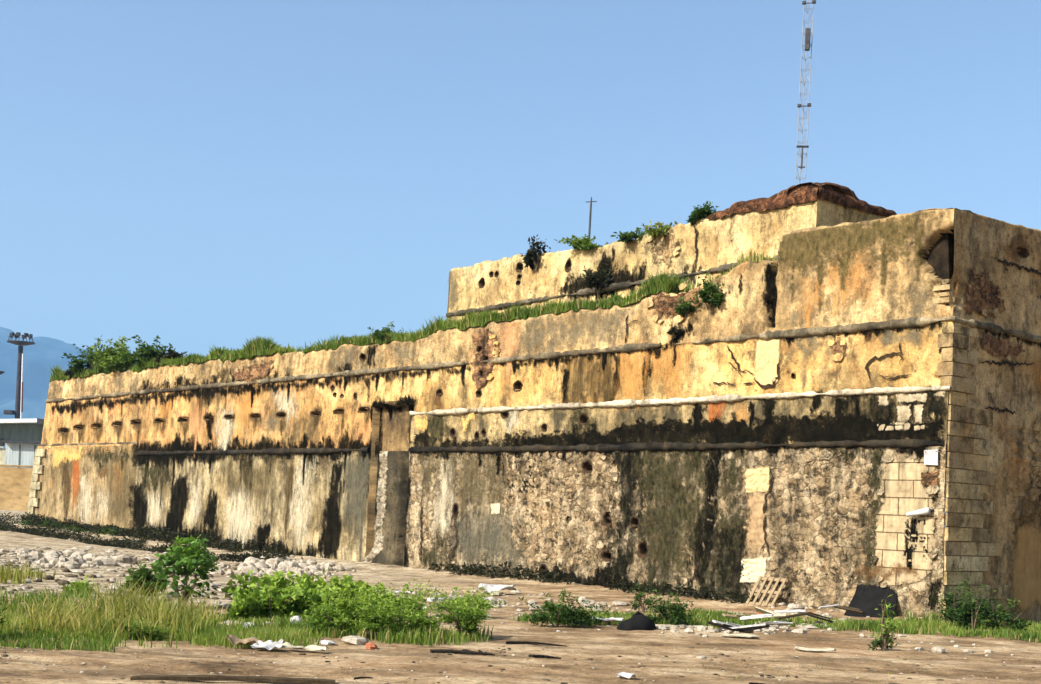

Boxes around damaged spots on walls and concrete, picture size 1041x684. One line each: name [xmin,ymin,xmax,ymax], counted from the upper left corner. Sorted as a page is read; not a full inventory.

water stain [914,224,937,281]
flaking render [472,326,501,390]
crack [712,346,780,388]
crack [865,341,912,380]
water stain [51,245,948,595]
flaking render [764,448,939,611]
water stain [927,579,941,611]
flaking render [1012,521,1041,612]